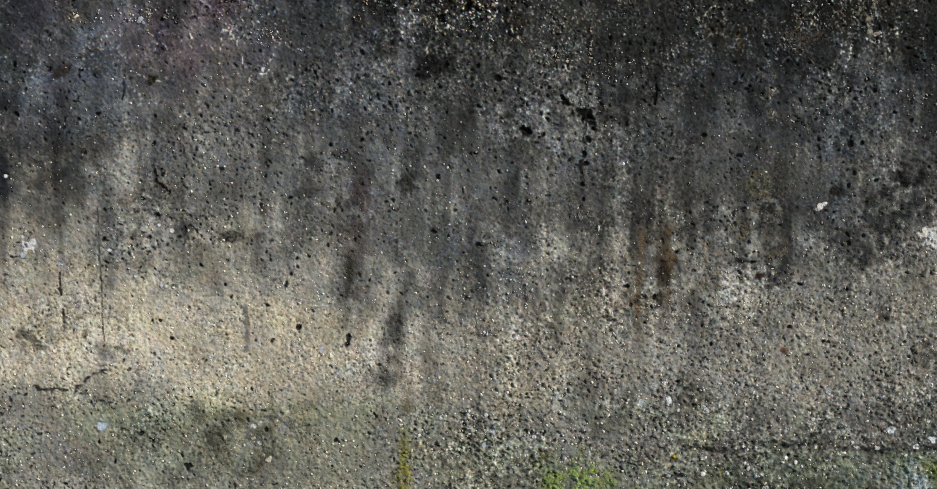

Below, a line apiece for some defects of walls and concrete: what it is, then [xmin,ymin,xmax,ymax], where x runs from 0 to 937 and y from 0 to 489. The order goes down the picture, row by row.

water stain [864,172,925,234]
corrosion [655,226,673,306]
water stain [390,299,404,342]